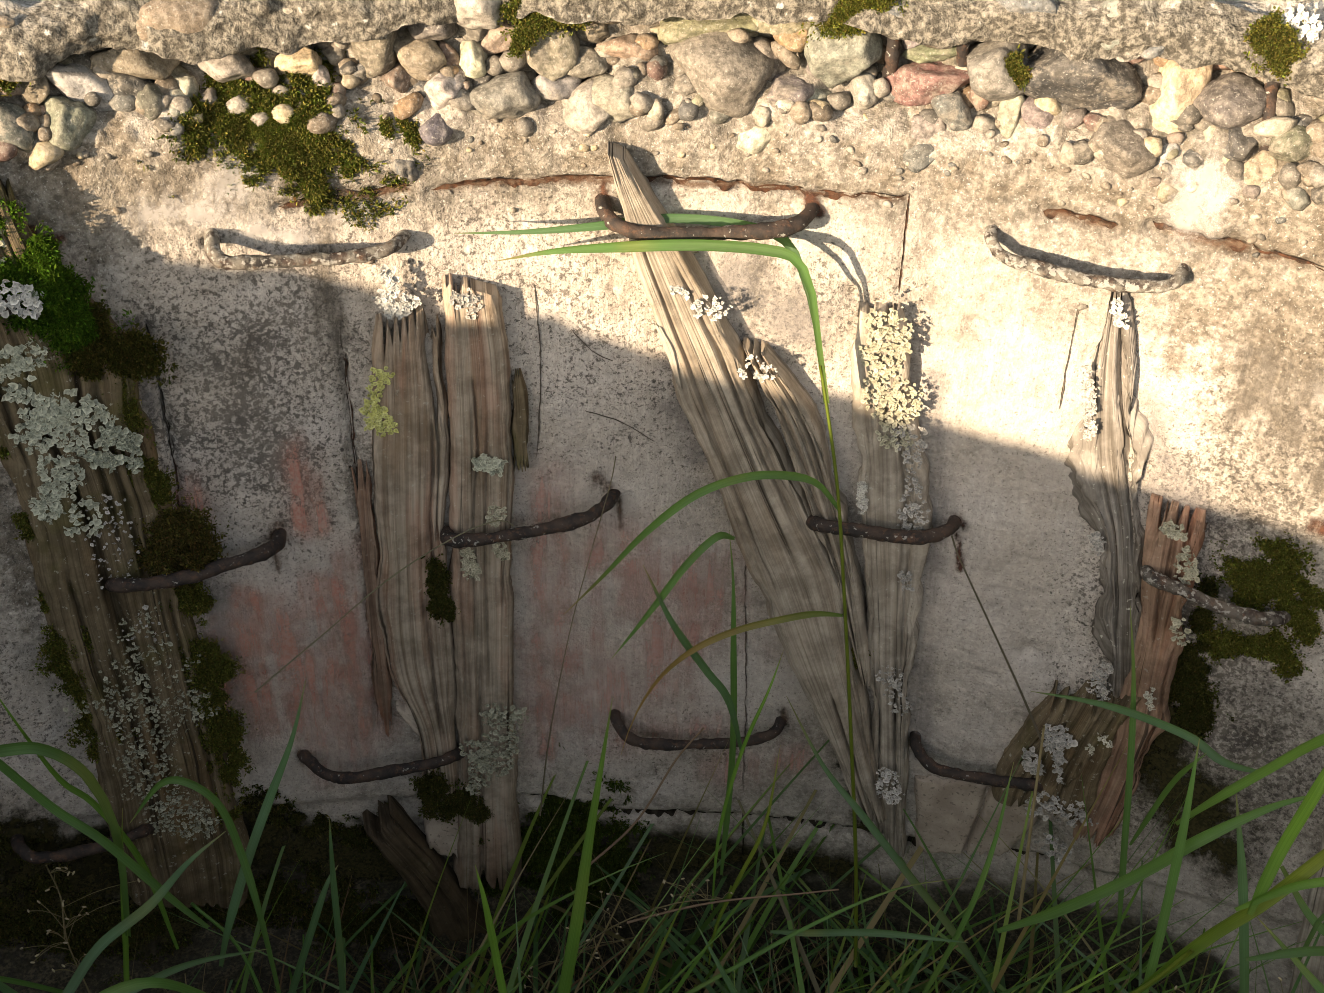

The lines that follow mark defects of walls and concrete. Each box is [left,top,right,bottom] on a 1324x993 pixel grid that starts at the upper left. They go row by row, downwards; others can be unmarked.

rust [460,176,614,197]
rust [803,191,825,218]
crack [146,324,180,509]
rust [592,474,622,528]
rust [955,517,966,572]
rust [1308,519,1324,536]